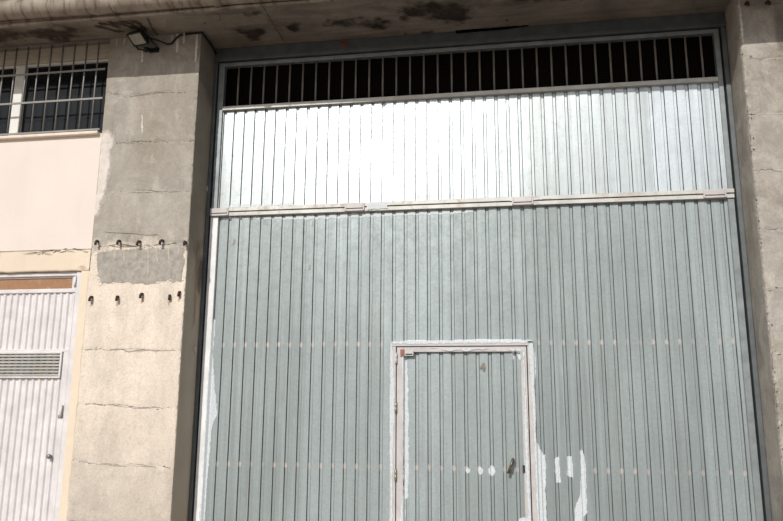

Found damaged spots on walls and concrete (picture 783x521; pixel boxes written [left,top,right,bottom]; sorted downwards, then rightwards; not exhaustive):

leakage [400,1,471,22]
leakage [330,17,389,29]
leakage [167,12,268,63]